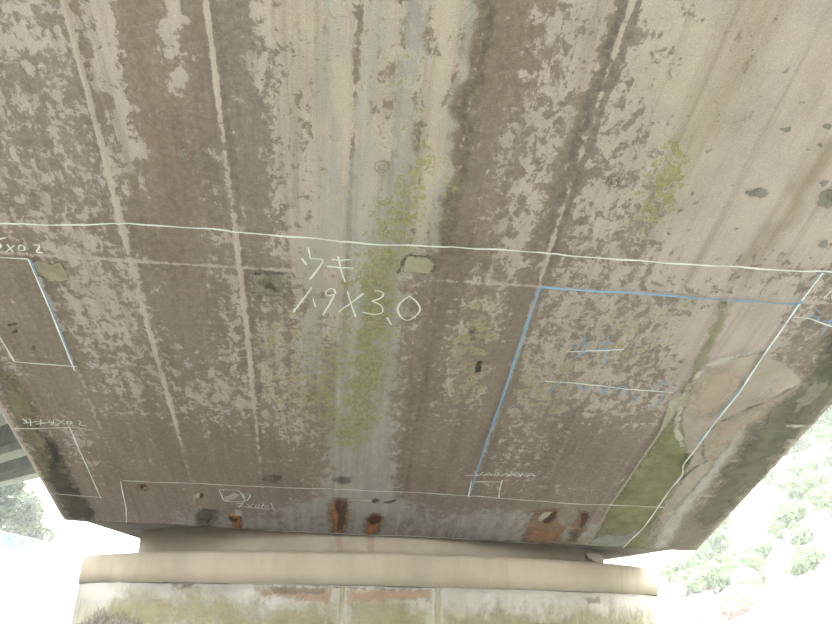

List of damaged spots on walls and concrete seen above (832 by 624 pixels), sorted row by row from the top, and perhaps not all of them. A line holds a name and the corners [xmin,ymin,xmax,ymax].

water stain [650,352,801,549]
rust [328,498,350,534]
rust [365,513,384,535]
rust [524,508,589,544]
water stain [262,587,330,603]